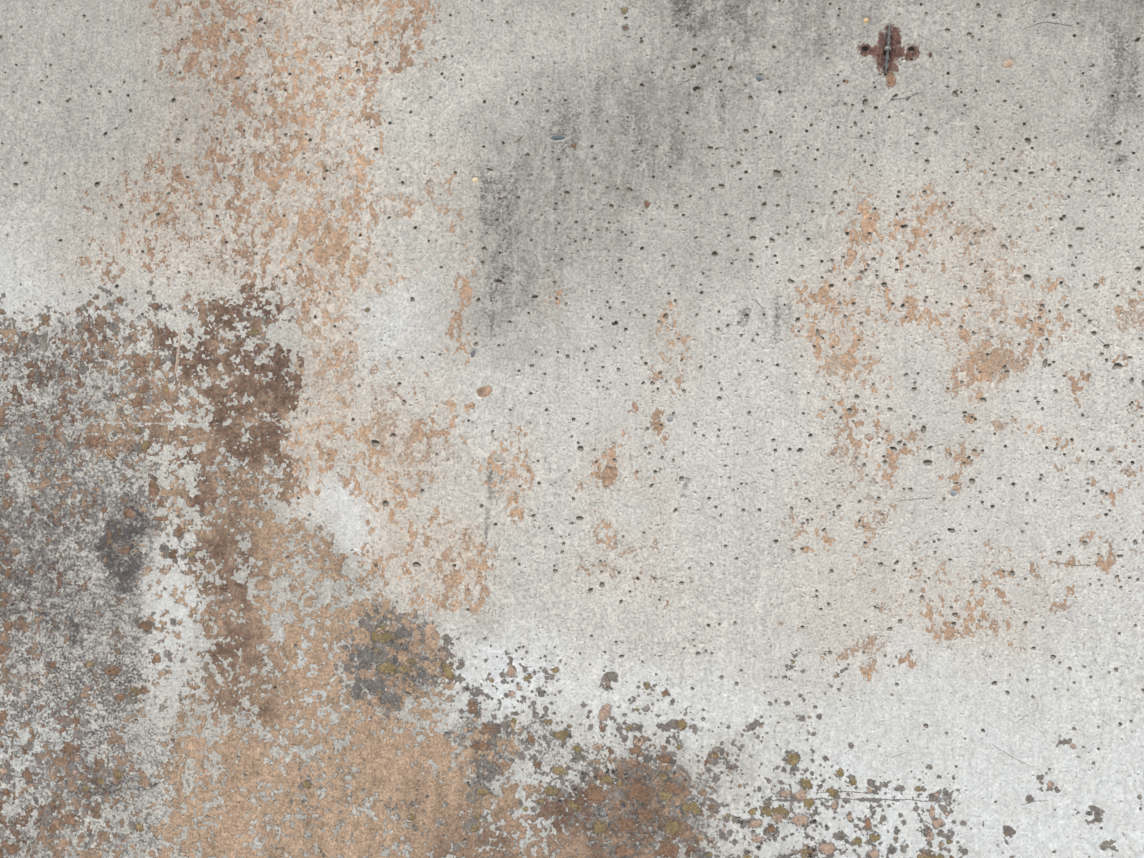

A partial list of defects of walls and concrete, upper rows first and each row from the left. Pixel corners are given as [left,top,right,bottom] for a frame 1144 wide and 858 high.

rust [857,24,932,87]
peeling [75,0,535,623]
peeling [649,300,693,394]
spalling [572,430,655,492]
peeling [645,400,670,447]
damp [0,283,732,858]
peeling [578,503,637,578]